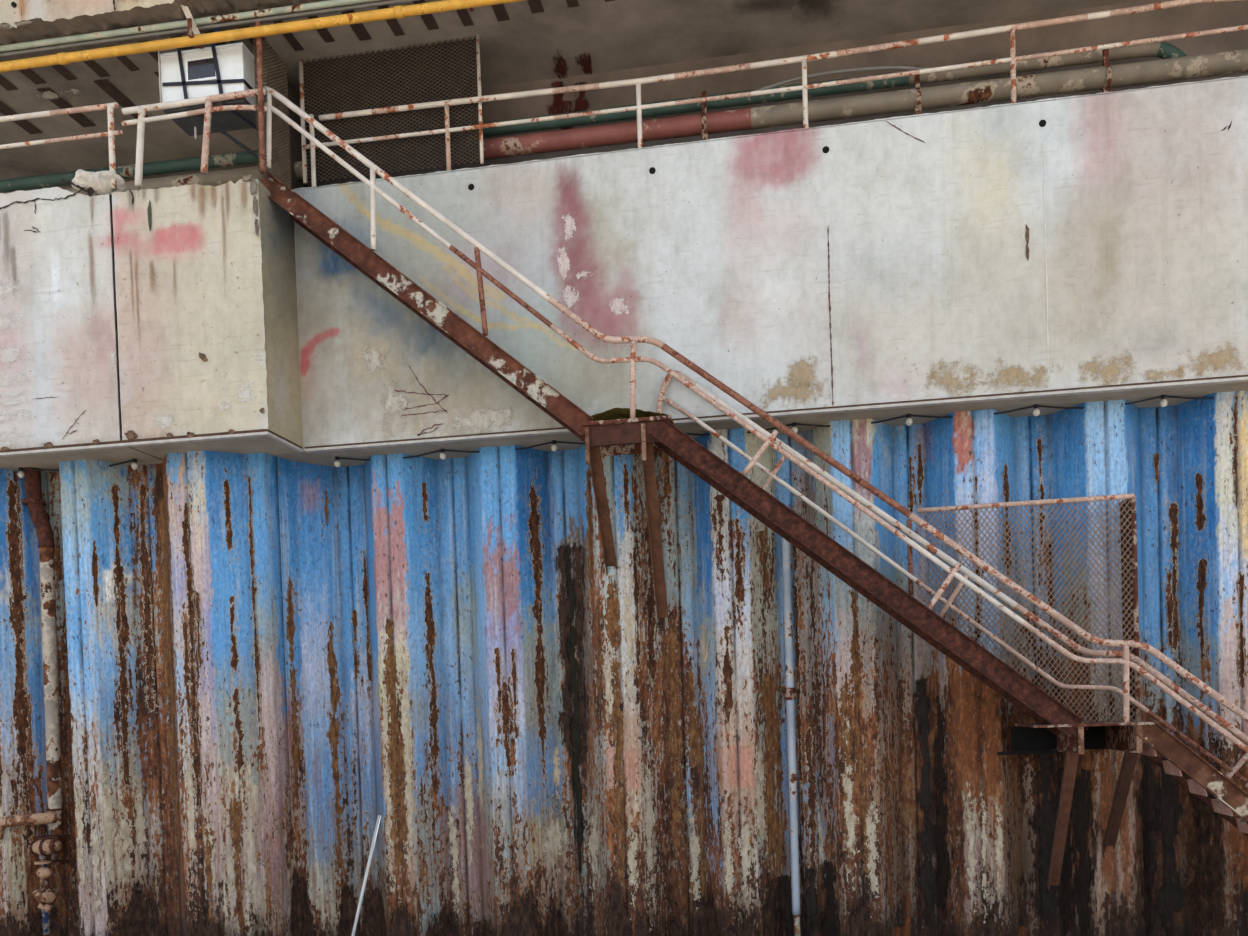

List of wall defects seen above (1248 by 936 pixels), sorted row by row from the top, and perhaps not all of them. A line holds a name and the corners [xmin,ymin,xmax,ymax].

crack [394,365,449,436]
rust [5,480,34,866]
peeling [73,731,147,926]
rust [91,482,202,868]
peeling [183,735,258,930]
rust [229,473,261,773]
rust [351,550,408,877]
peeling [381,625,415,918]
peeling [447,659,486,920]
rust [528,483,547,779]
leakage [554,543,589,899]
rust [586,455,708,900]